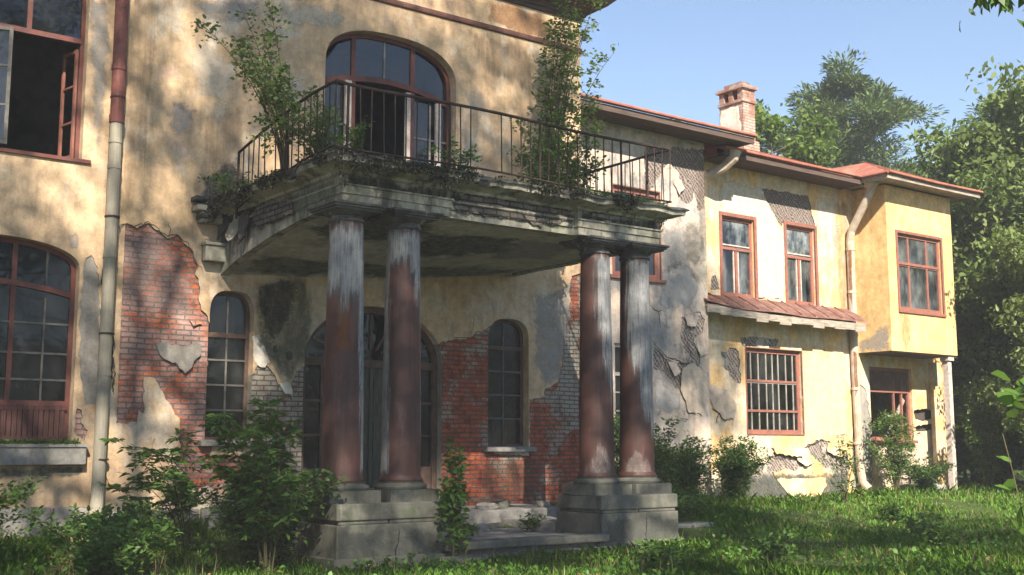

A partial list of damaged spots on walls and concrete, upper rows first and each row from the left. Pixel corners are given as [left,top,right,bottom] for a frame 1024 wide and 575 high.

flaking render [644,145,705,211]
flaking render [116,223,304,503]
water stain [249,257,328,334]
peeling [326,223,364,473]
water stain [364,264,386,277]
peeling [380,228,421,476]
flaking render [438,274,580,506]
peeling [594,254,719,435]
crack [650,305,691,372]
flaking render [721,337,778,384]
peeling [719,181,839,302]
flaking render [740,385,872,498]